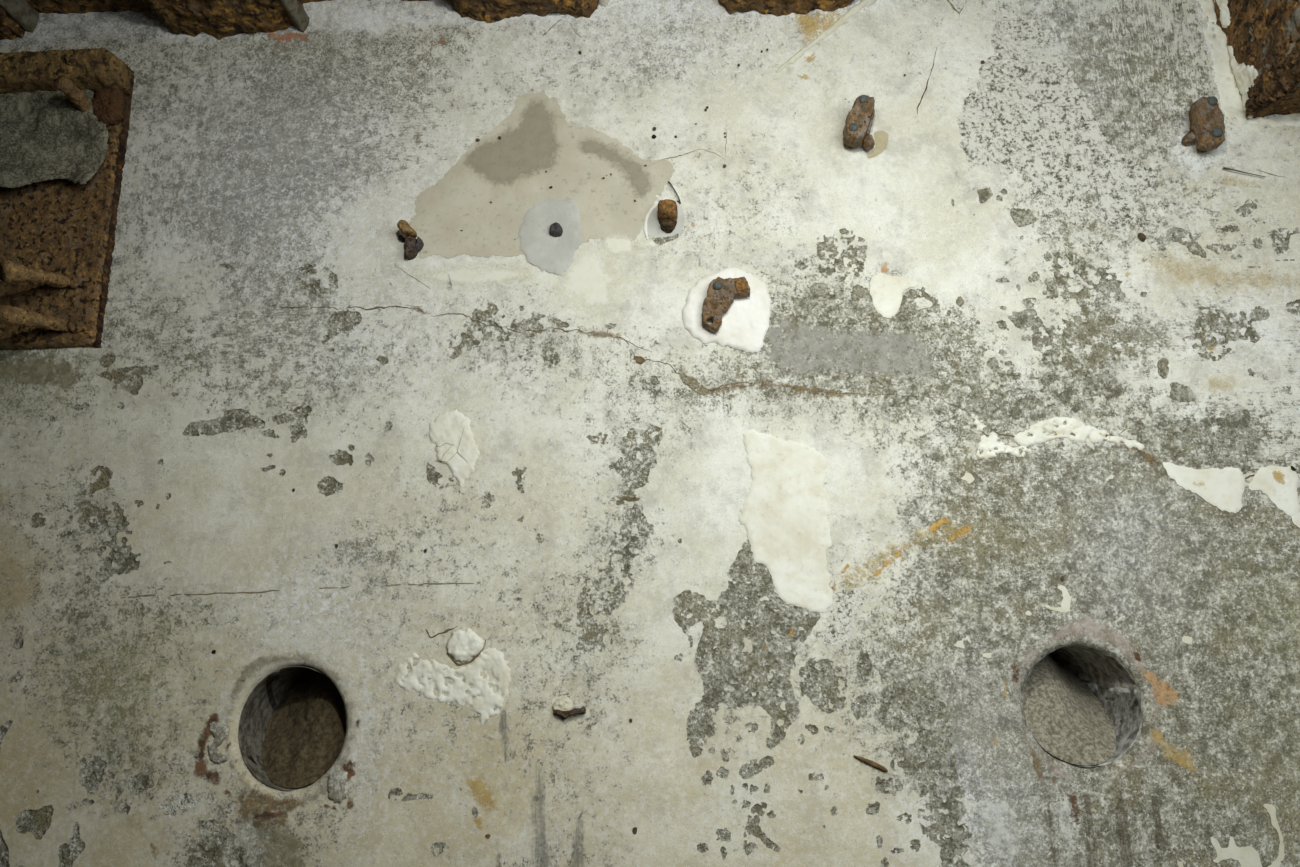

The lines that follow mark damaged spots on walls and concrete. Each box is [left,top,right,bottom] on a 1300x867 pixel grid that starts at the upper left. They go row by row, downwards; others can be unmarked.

damp [466,103,557,183]
damp [582,141,649,195]
peeling [634,356,661,398]
peeling [182,405,312,476]
peeling [317,444,374,496]
peeling [571,424,662,670]
peeling [672,539,972,867]
rust [194,713,296,827]